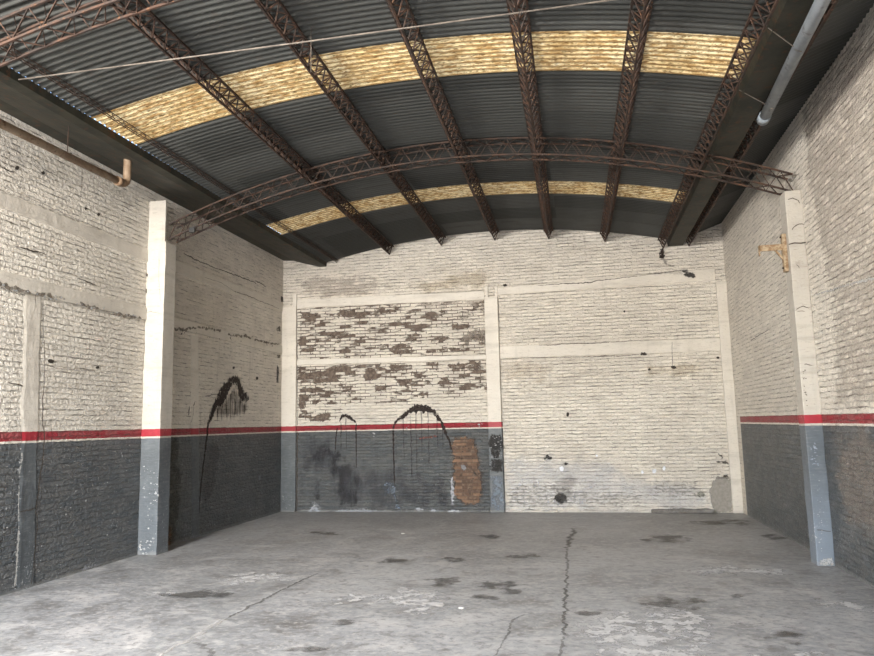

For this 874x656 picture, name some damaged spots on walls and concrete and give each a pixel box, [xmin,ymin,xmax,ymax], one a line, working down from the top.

peeling [297,300,487,422]
crack [20,328,111,584]
flaking render [450,434,504,510]